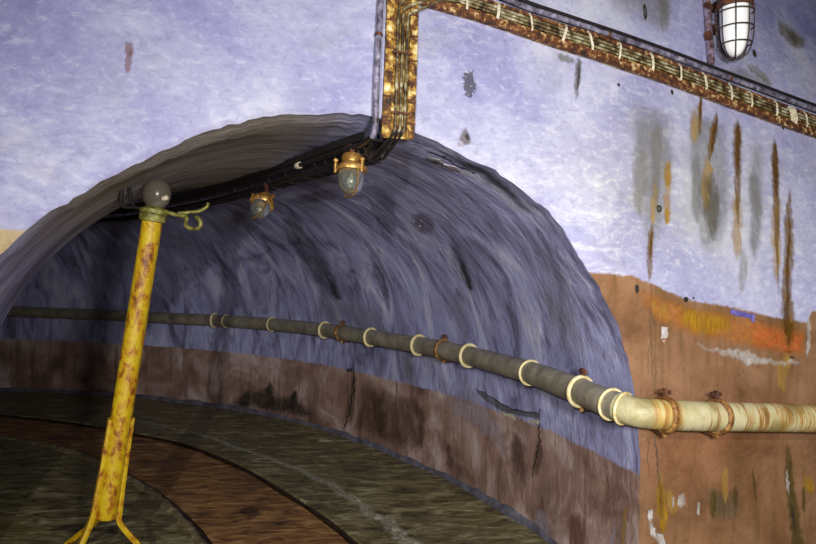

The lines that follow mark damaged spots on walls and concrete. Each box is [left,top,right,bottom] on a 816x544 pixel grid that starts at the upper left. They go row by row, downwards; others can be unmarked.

damp [641,131,671,224]
corrosion [691,97,718,207]
damp [693,182,718,233]
corrosion [647,143,802,366]
corrosion [733,123,742,247]
damp [786,453,814,544]